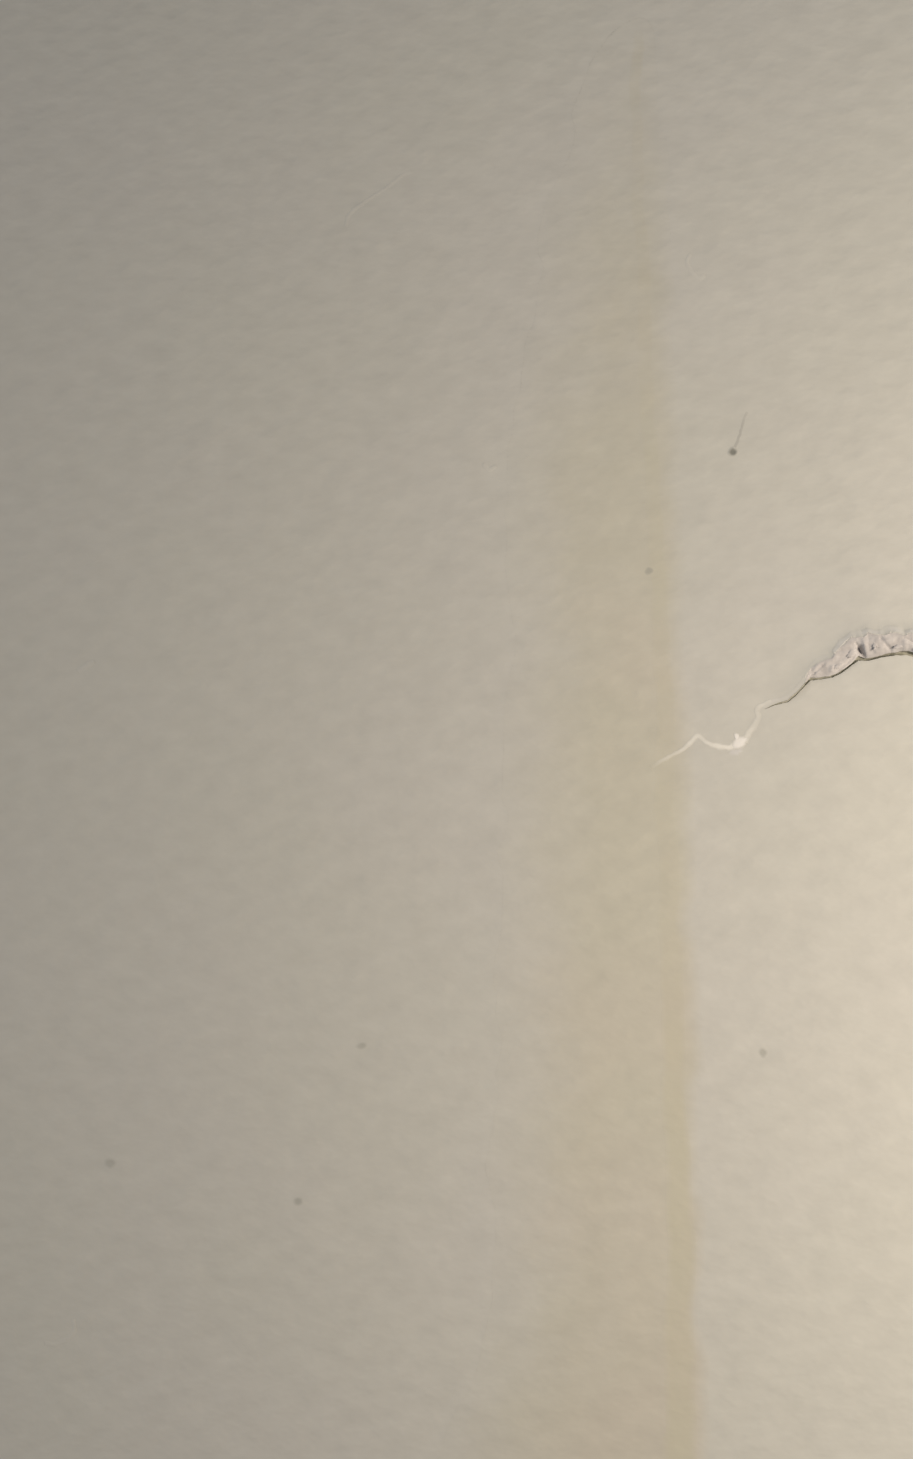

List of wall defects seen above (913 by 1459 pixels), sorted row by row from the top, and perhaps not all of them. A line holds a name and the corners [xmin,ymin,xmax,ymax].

crack [650,625,913,768]